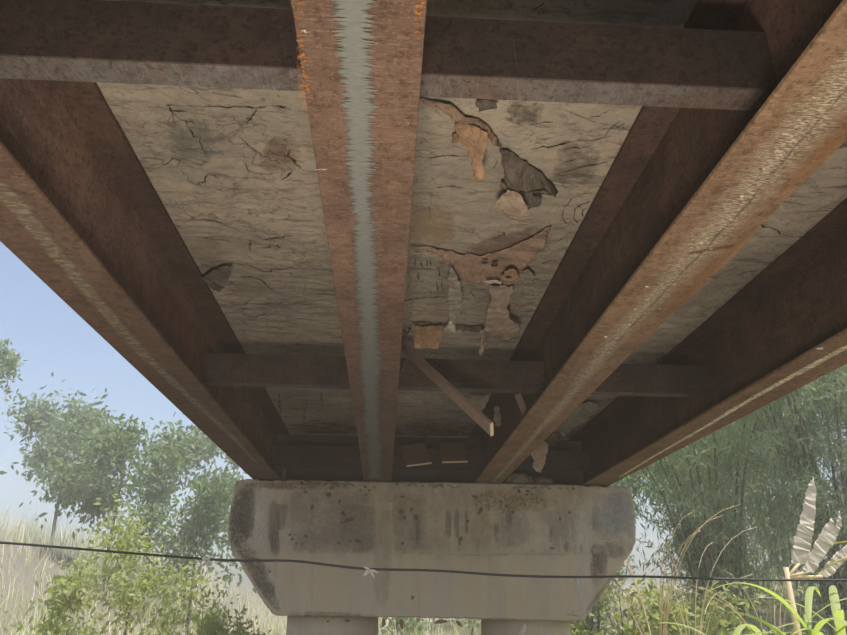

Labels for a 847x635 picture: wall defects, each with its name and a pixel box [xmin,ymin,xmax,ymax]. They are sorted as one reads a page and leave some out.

crack [166,105,300,179]
water stain [230,489,279,604]